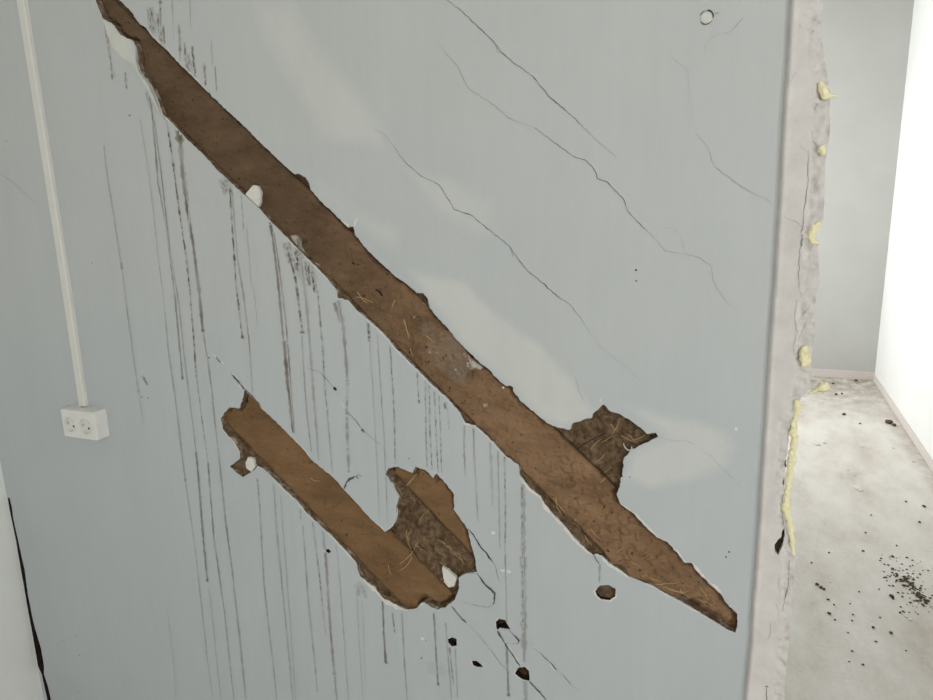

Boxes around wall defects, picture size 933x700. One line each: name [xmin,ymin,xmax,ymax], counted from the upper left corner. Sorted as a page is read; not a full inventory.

water stain [146,0,218,92]
water stain [127,92,247,700]
water stain [217,176,258,393]
water stain [268,222,333,473]
spalling [102,0,737,628]
crack [374,128,638,378]
crack [442,0,730,305]
crack [700,10,744,54]
water stain [299,509,349,700]
crack [468,529,499,580]
peeling [495,618,520,644]
crack [451,606,580,700]